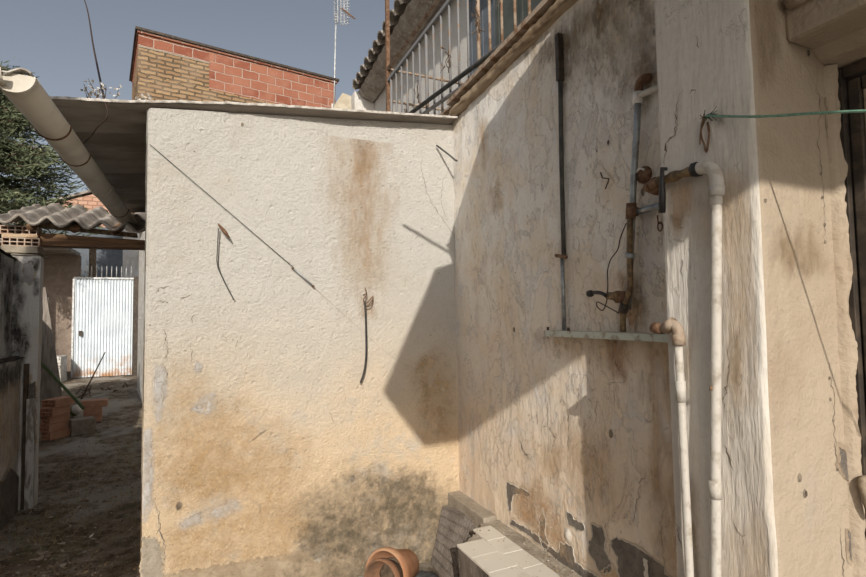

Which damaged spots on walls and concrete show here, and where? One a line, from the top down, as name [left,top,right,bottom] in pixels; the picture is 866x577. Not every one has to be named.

crack [664,90,696,157]
damp [0,253,29,454]
crack [536,400,570,486]
spalling [506,481,673,577]